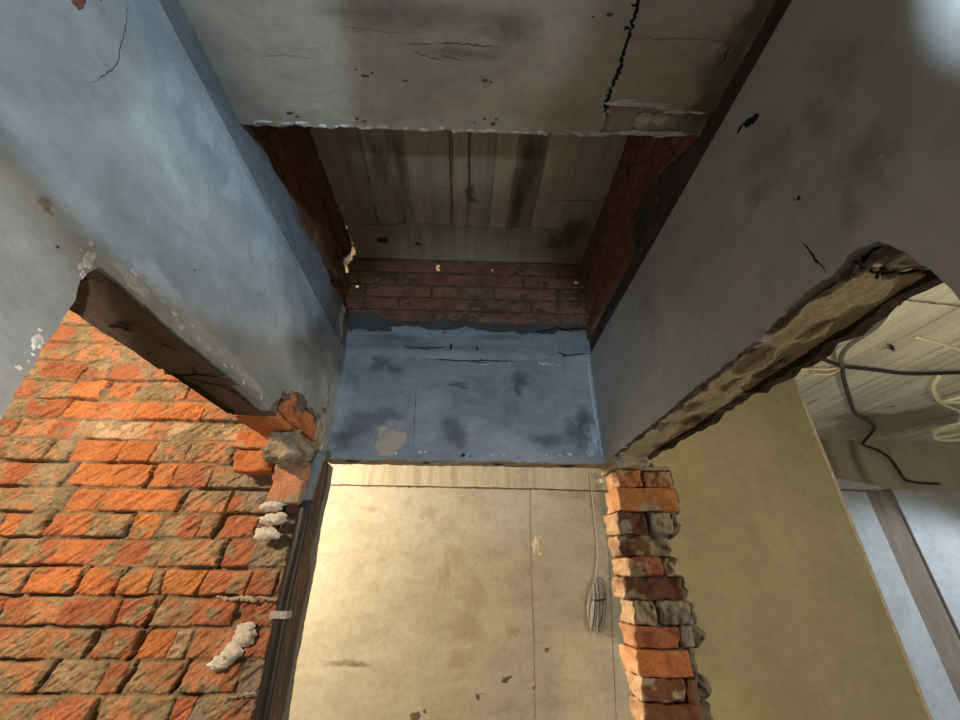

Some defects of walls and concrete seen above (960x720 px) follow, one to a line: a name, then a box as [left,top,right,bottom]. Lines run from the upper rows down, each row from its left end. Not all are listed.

crack [90,4,128,83]
crack [600,0,748,133]
spalling [252,90,710,138]
spalling [77,241,96,279]
crack [799,243,826,272]
spalling [281,391,330,451]
water stain [374,424,407,457]